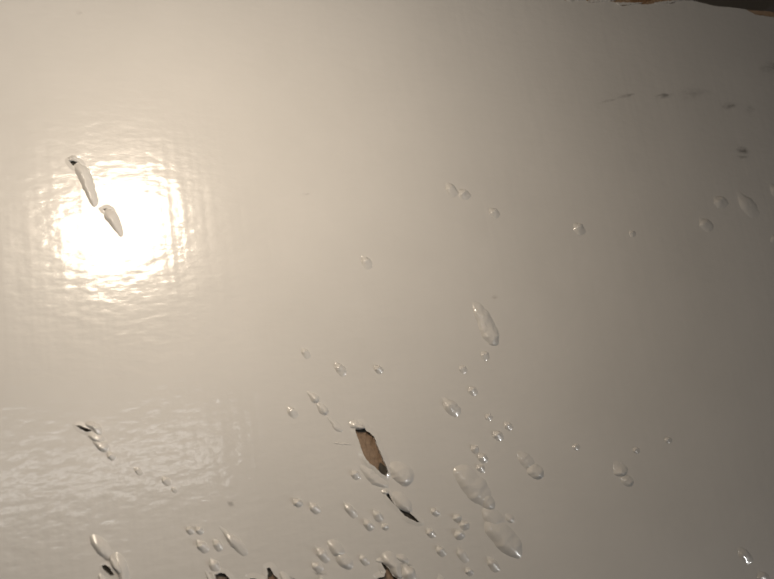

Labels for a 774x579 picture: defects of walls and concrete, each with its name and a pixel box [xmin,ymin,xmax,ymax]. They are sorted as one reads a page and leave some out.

peeling [333,419,425,527]
peeling [205,562,291,579]
peeling [372,551,409,579]